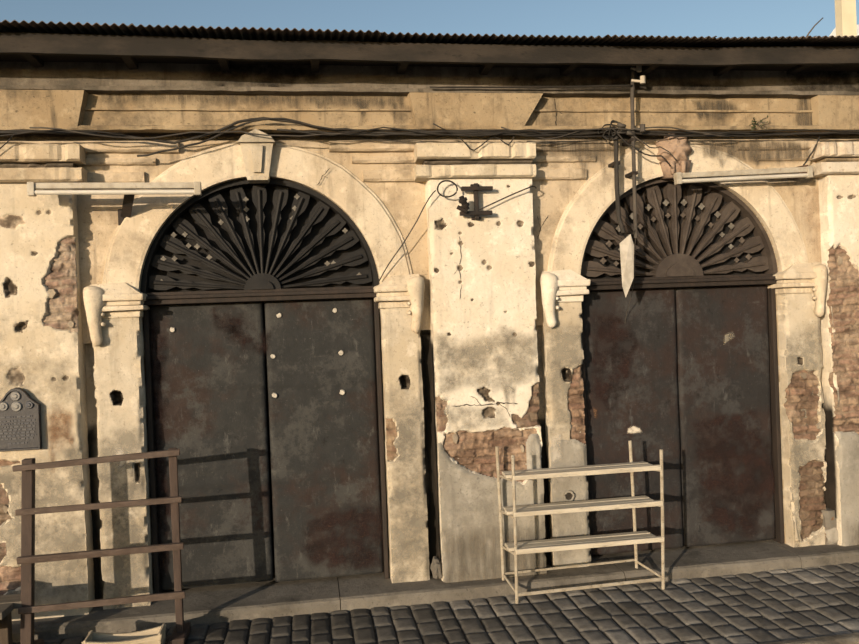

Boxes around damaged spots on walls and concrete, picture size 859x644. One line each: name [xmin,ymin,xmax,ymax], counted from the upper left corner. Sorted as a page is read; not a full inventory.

water stain [209,64,315,104]
water stain [558,76,730,91]
water stain [697,102,733,119]
water stain [791,71,859,125]
spalling [43,238,79,333]
spalling [784,245,859,440]
crack [454,396,517,416]
water stain [390,330,581,583]
spalling [435,383,540,482]
spalling [567,365,586,444]
spalling [798,460,834,541]
spalling [0,542,21,595]